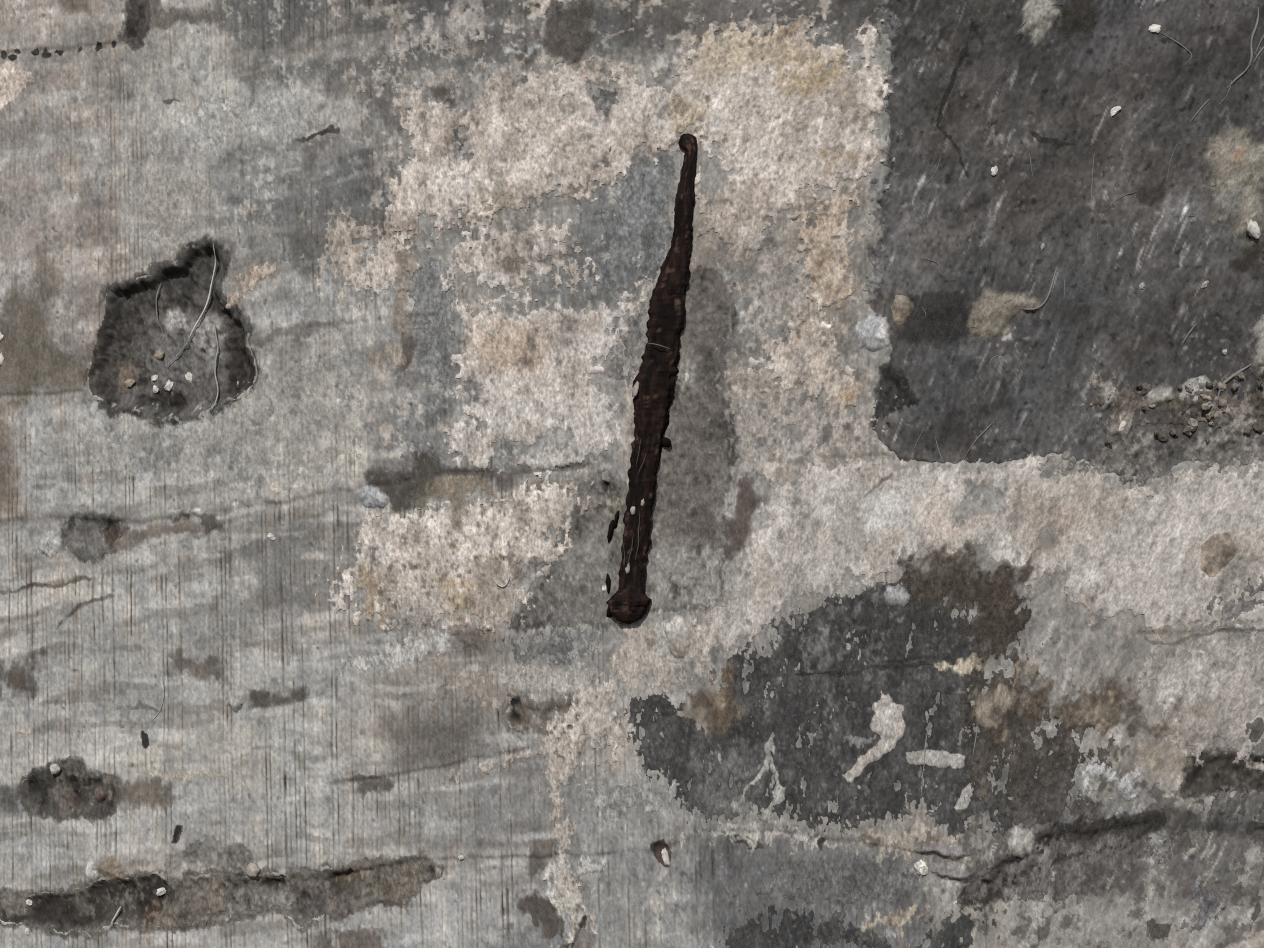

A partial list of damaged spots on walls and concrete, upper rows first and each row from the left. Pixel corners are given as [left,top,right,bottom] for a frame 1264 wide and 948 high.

hole [85,236,259,428]
hole [871,364,918,427]
spalling [1038,362,1264,490]
spalling [60,512,128,562]
corrosion [607,510,620,543]
hole [19,756,118,823]
peeling [623,565,1264,948]
spalling [156,838,258,896]